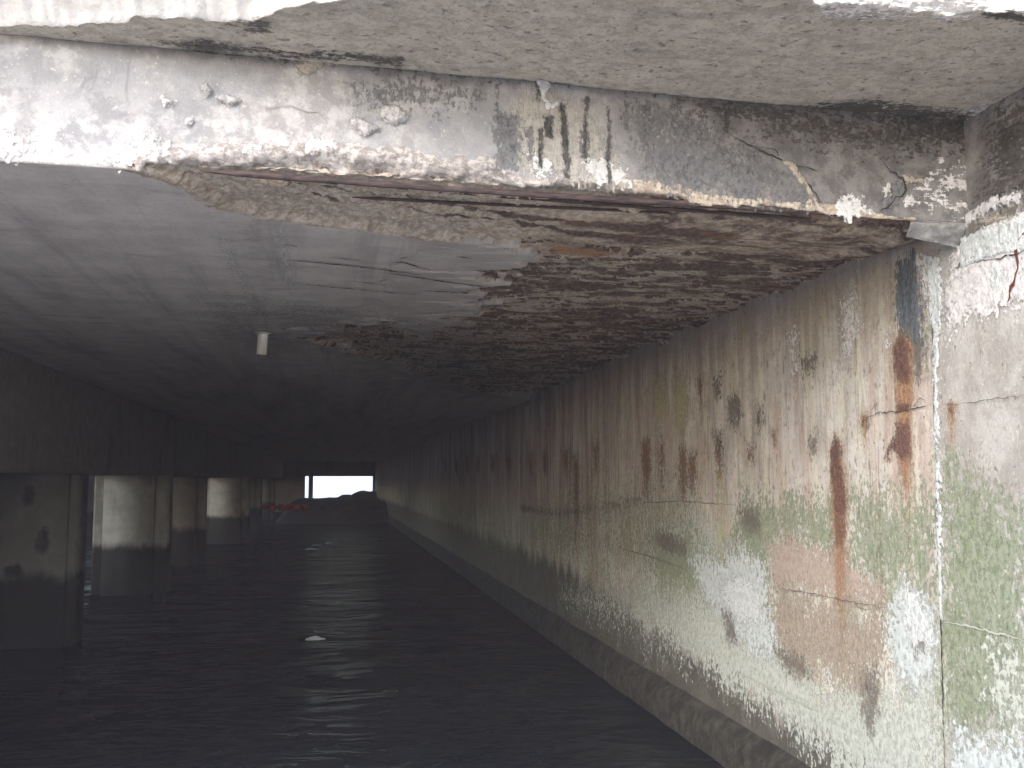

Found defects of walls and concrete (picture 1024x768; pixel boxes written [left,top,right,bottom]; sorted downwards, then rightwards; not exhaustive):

peeling [0,127,37,165]
water stain [161,17,1024,217]
crack [726,131,831,215]
water stain [835,192,872,224]
crack [879,163,928,213]
peeling [114,124,919,395]
crack [955,232,1024,302]
corrosion [640,433,698,508]
corrosion [884,331,915,496]
water stain [882,248,944,620]
corrosion [829,434,848,635]
water stain [859,663,883,741]